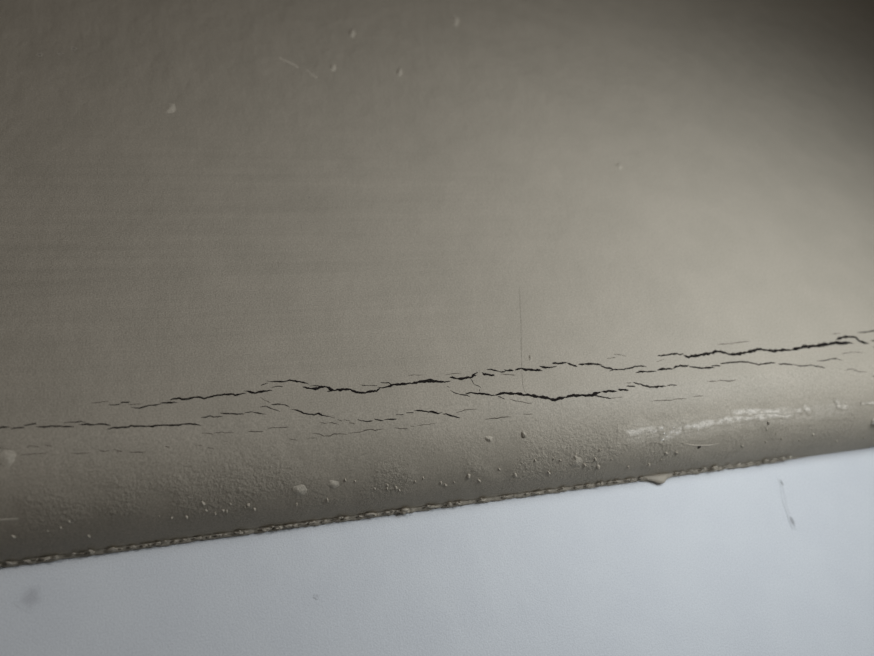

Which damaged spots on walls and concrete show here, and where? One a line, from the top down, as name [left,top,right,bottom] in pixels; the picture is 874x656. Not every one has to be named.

crack [0,330,874,455]